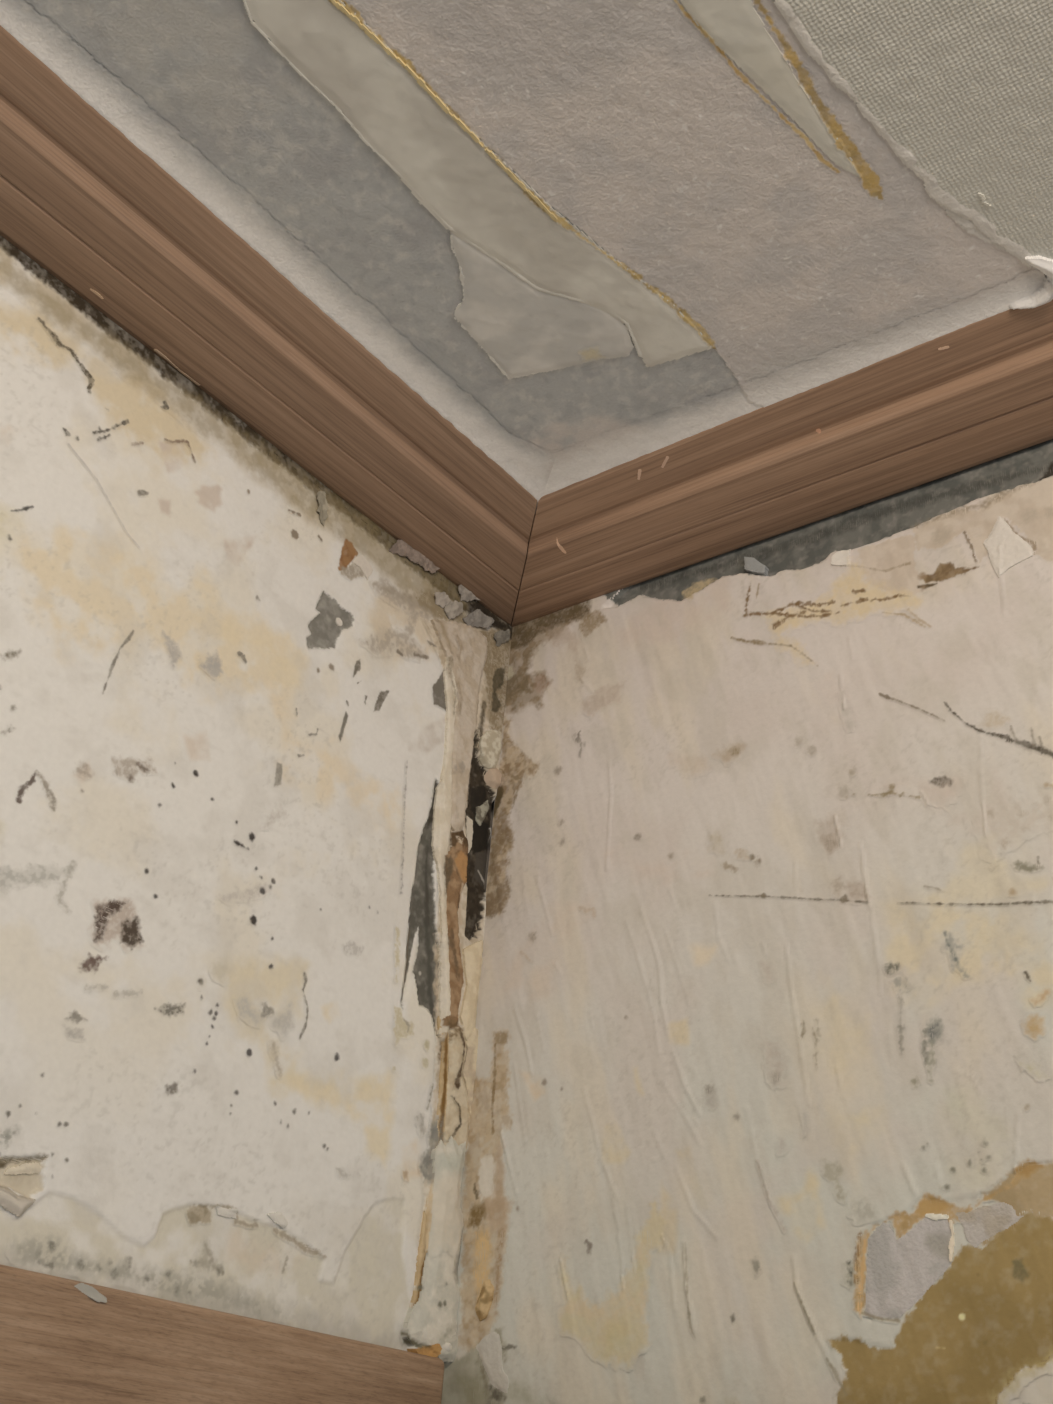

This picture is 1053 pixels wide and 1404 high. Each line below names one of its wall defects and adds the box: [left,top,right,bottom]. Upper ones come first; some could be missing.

peeling [287,491,329,542]
spalling [337,537,373,582]
peeling [389,540,440,574]
spalling [600,439,1053,629]
spalling [306,590,355,674]
crack [741,580,926,631]
spalling [338,658,390,743]
spalling [273,727,319,788]
damp [0,235,628,1404]
peeling [401,585,510,1150]
crack [708,852,1053,907]